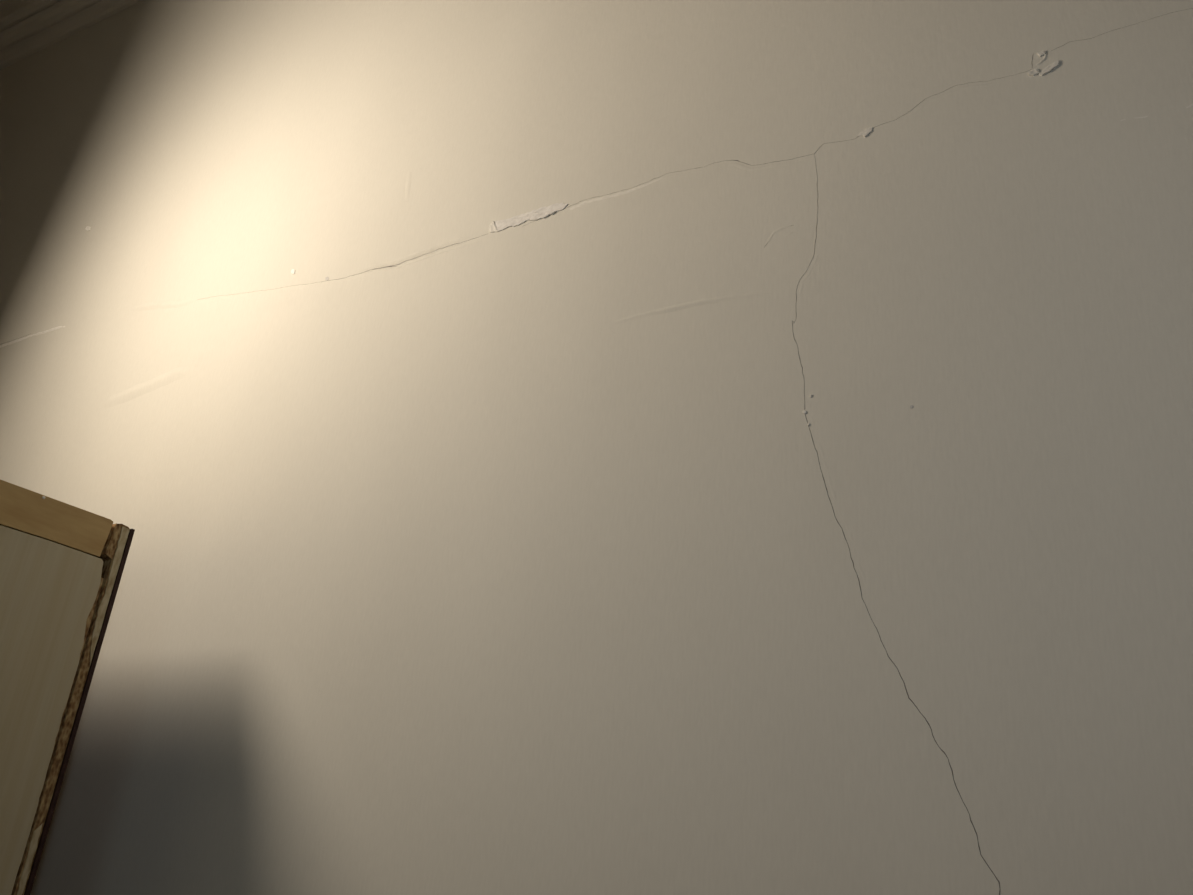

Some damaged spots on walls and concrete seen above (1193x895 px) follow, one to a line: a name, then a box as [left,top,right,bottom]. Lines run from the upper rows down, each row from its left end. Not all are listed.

crack [792,161,1000,895]